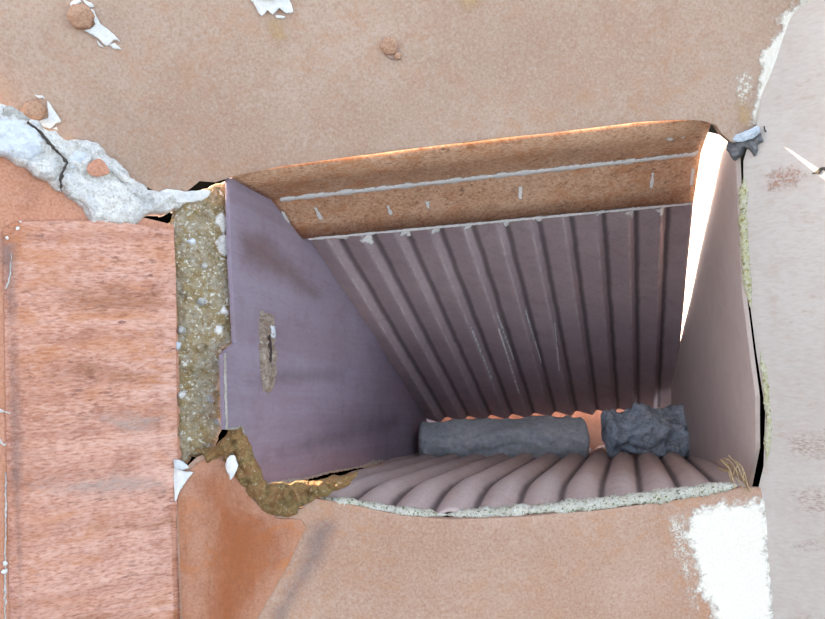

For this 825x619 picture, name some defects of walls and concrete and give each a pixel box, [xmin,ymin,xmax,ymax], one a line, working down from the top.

peeling [70,0,121,49]
peeling [251,0,293,19]
peeling [726,0,810,161]
crack [27,121,68,191]
spalling [0,95,232,502]